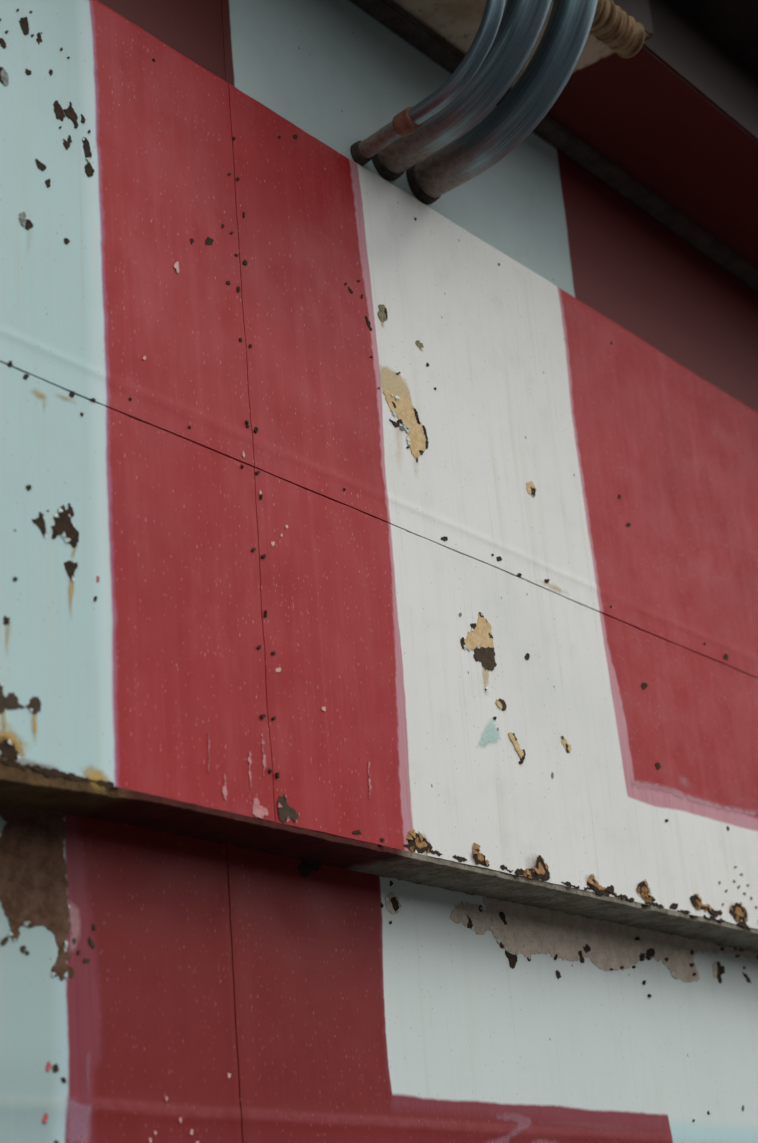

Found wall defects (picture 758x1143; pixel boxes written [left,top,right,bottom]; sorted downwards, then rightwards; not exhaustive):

peeling [0,9,42,49]
peeling [35,159,51,188]
peeling [53,100,94,177]
peeling [378,367,429,463]
corrosion [32,503,79,604]
peeling [459,612,497,690]
corrosion [0,683,114,790]
peeling [480,699,526,764]
peeling [252,794,299,823]
corrosion [0,805,96,981]
peeling [637,879,652,903]
peeling [450,896,758,983]